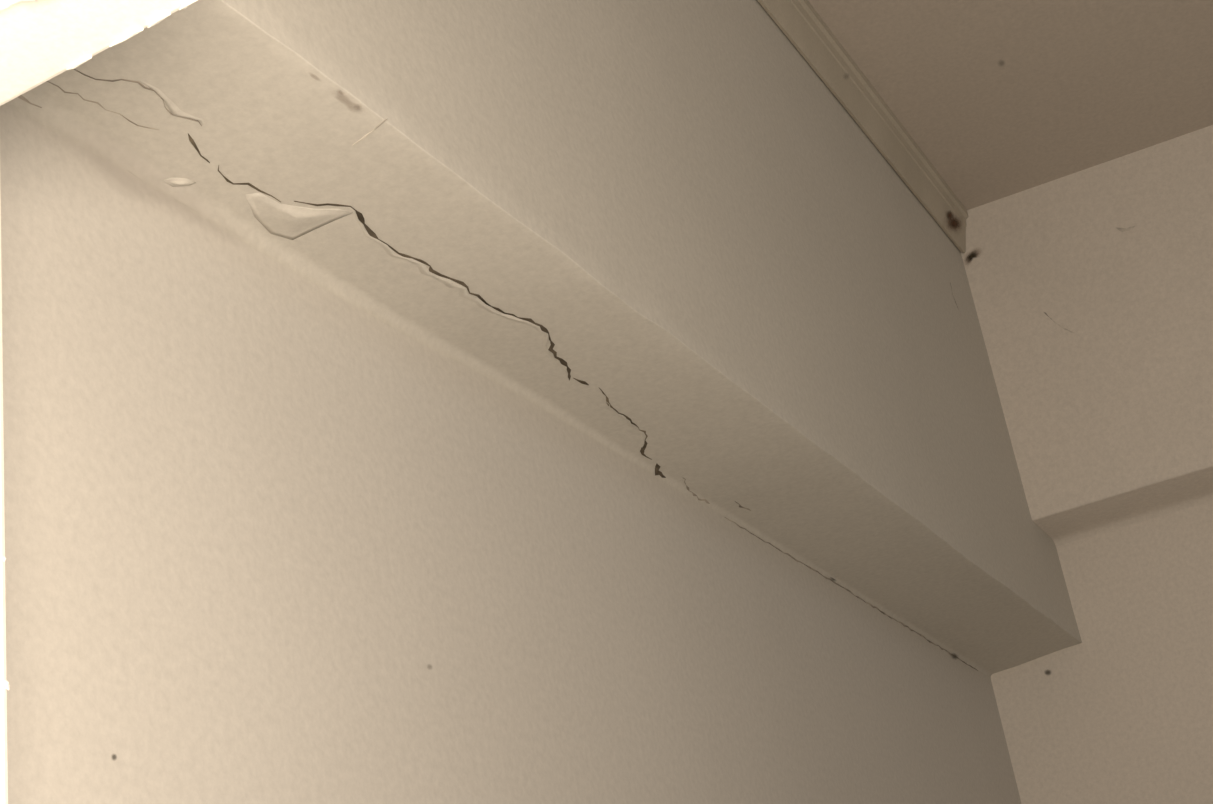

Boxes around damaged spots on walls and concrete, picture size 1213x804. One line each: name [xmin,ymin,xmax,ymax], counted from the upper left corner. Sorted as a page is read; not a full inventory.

crack [18,69,978,671]